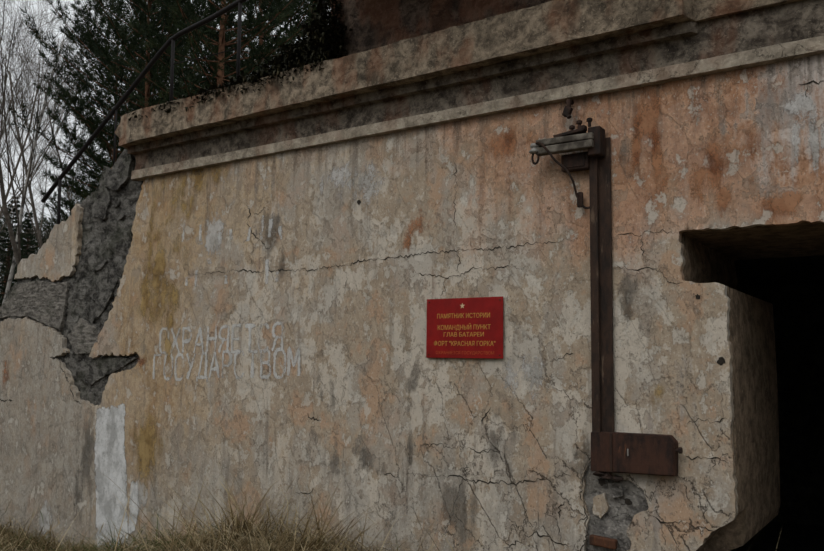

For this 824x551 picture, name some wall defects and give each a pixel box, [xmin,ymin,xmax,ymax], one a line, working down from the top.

spalling [0,149,143,406]
crack [190,160,585,294]
crack [384,439,591,551]
spalling [584,462,649,551]
crack [646,509,714,544]